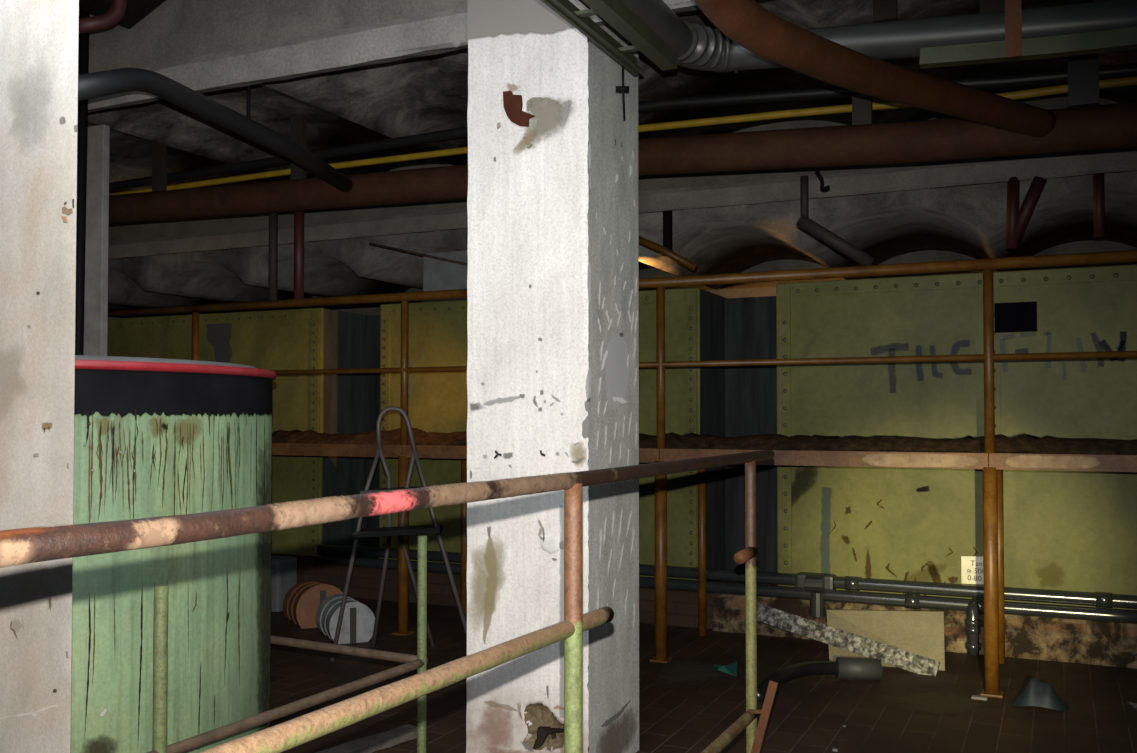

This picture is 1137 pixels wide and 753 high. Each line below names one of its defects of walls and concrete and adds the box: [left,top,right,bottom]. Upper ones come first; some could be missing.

spalling [517,97,572,150]
corrosion [89,414,205,522]
corrosion [219,422,240,510]
corrosion [257,451,272,506]
corrosion [256,531,272,729]
leakage [475,527,500,644]
peeling [538,505,564,622]
spalling [518,640,564,753]